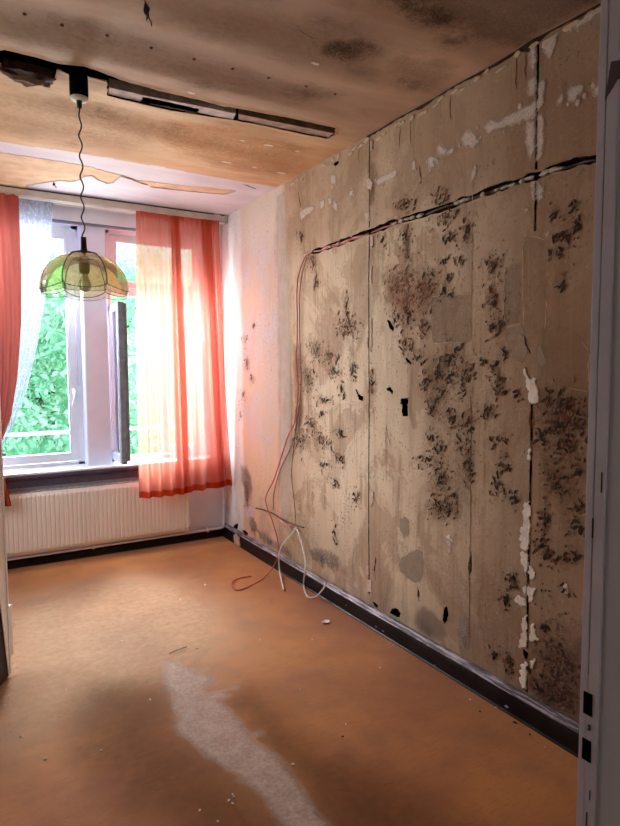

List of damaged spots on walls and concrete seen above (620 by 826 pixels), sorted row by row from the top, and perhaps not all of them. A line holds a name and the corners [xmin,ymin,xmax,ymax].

peeling [0,58,56,88]
spalling [386,306,475,414]
crack [283,3,601,594]
crack [514,333,540,693]